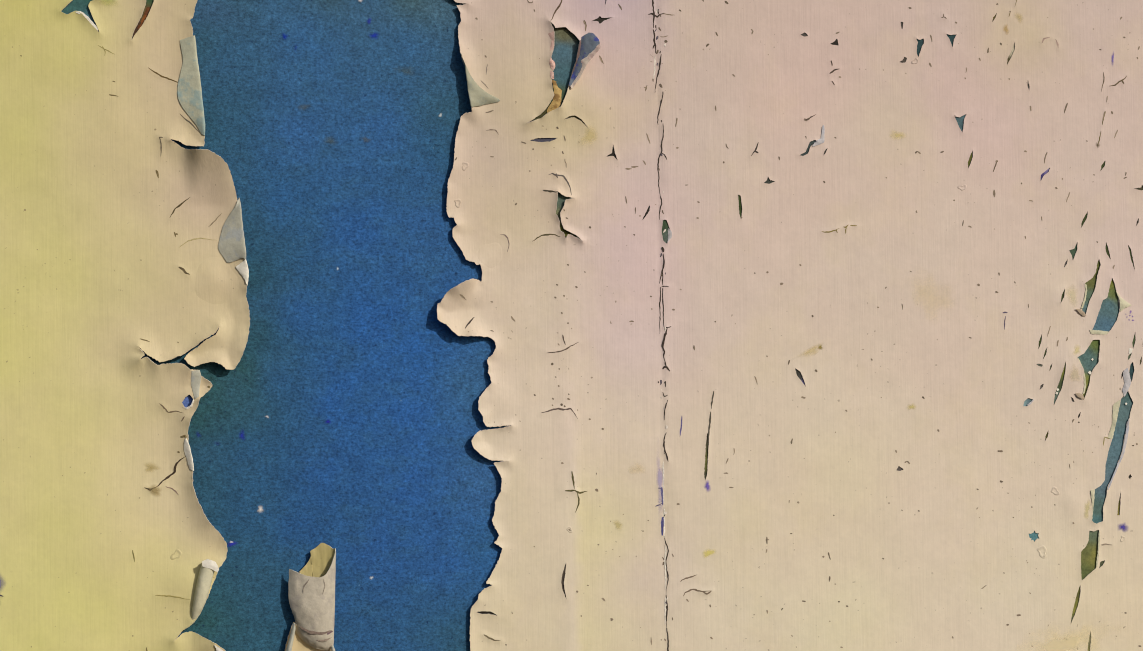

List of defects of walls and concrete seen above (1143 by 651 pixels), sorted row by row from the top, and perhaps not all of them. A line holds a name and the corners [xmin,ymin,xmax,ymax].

peeling [61,0,99,32]
peeling [556,192,579,238]
peeling [530,0,609,126]
peeling [801,125,827,156]
peeling [140,0,511,651]
crack [648,0,714,651]
peeling [1024,243,1131,418]
peeling [1071,335,1142,622]